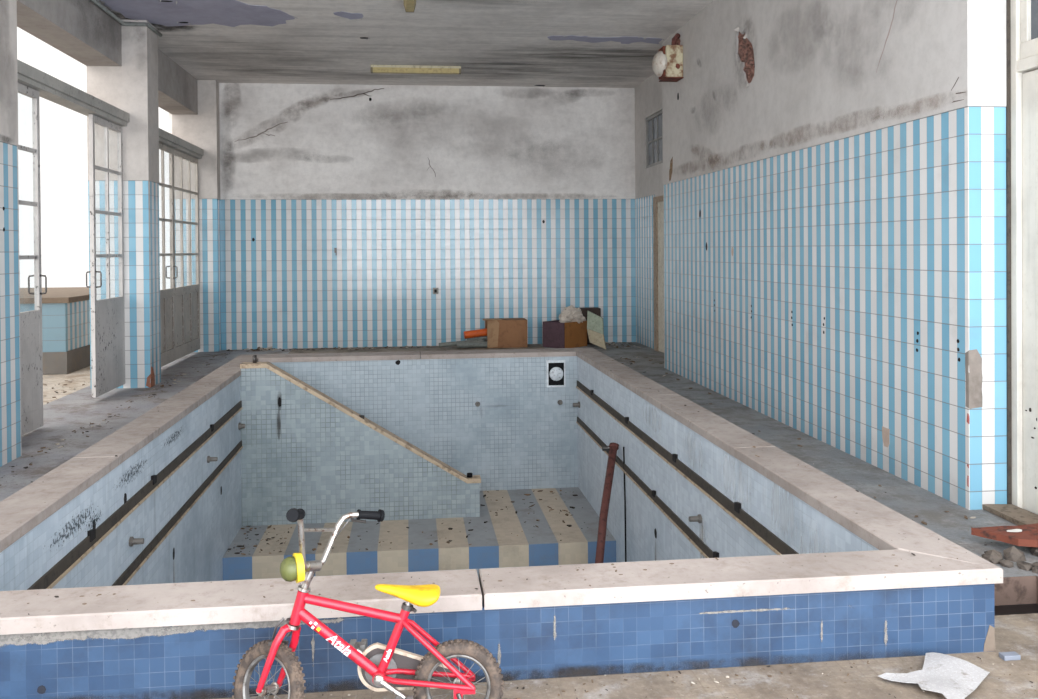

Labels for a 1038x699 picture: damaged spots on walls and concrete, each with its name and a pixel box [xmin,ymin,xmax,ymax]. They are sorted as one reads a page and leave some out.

peeling [101,0,298,27]
peeling [333,11,363,20]
peeling [548,33,680,45]
flaking render [734,27,755,89]
crack [330,88,384,100]
crack [235,122,287,142]
peeling [965,349,983,424]
peeling [0,620,306,646]